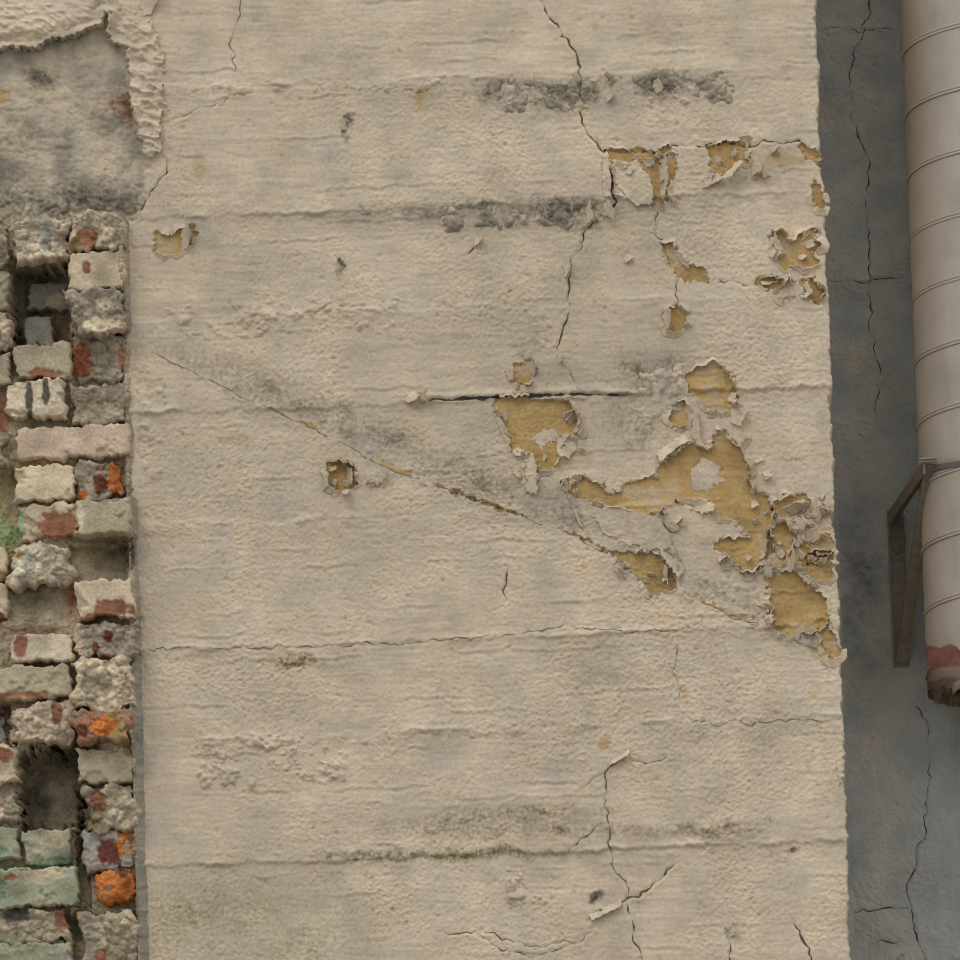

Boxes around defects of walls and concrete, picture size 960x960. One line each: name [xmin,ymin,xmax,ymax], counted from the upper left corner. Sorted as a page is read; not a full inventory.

crack [429,0,819,401]
peeling [659,302,694,339]
peeling [659,238,710,283]
peeling [702,135,778,189]
peeling [754,180,830,306]
peeling [798,142,824,161]
crack [824,0,895,411]
peeling [319,457,389,498]
crack [155,353,618,562]
peeling [492,356,847,669]
crack [148,583,837,727]
crack [445,756,676,959]